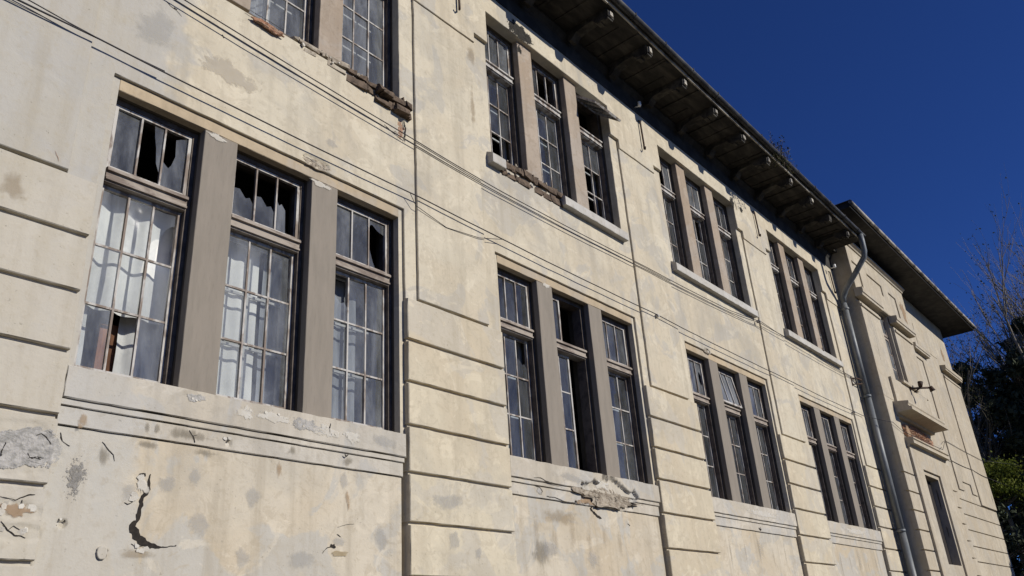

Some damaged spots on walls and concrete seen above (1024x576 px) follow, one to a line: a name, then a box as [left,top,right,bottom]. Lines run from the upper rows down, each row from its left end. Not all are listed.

spalling [249,9,413,139]
spalling [500,160,563,208]
peeling [237,405,323,433]
spalling [0,426,87,500]
crack [0,521,28,538]
crack [124,473,176,554]
spalling [572,480,640,510]